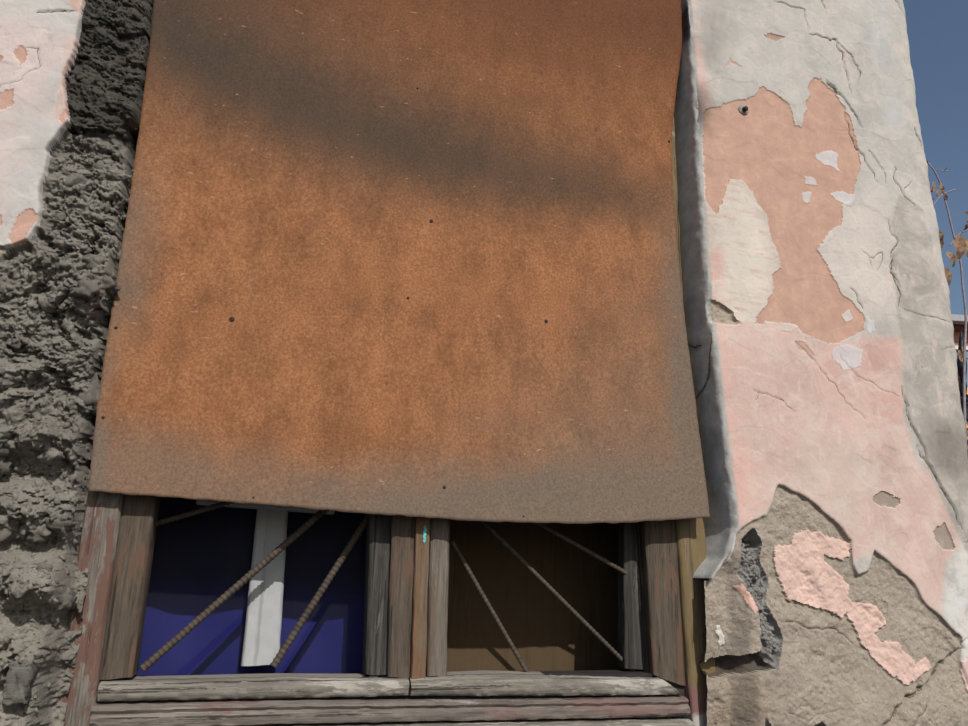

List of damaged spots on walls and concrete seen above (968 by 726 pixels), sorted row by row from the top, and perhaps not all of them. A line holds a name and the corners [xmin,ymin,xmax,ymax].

crack [776,0,914,204]
spalling [0,0,154,726]
peeling [702,77,875,370]
crack [803,348,963,530]
crack [861,222,949,322]
spalling [698,484,968,726]
crack [882,647,961,726]